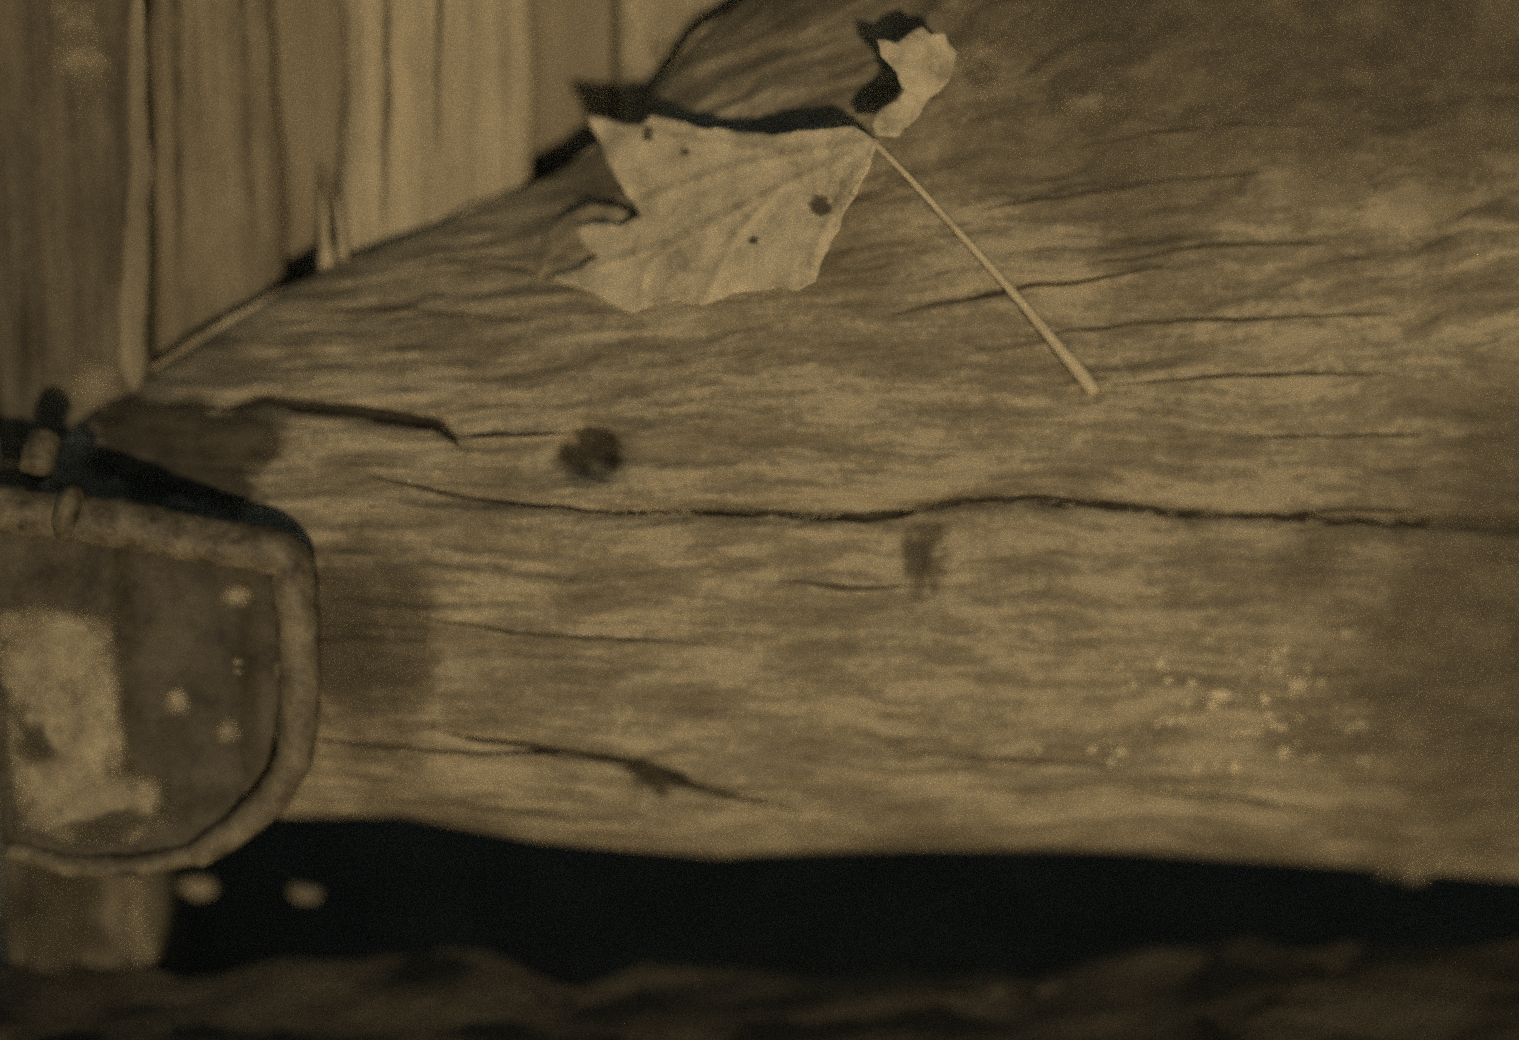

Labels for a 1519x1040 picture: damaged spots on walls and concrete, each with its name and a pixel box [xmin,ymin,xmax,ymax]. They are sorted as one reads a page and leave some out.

crack [151,396,570,449]
crack [1230,431,1449,439]
crack [368,476,1519,529]
crack [317,728,801,815]